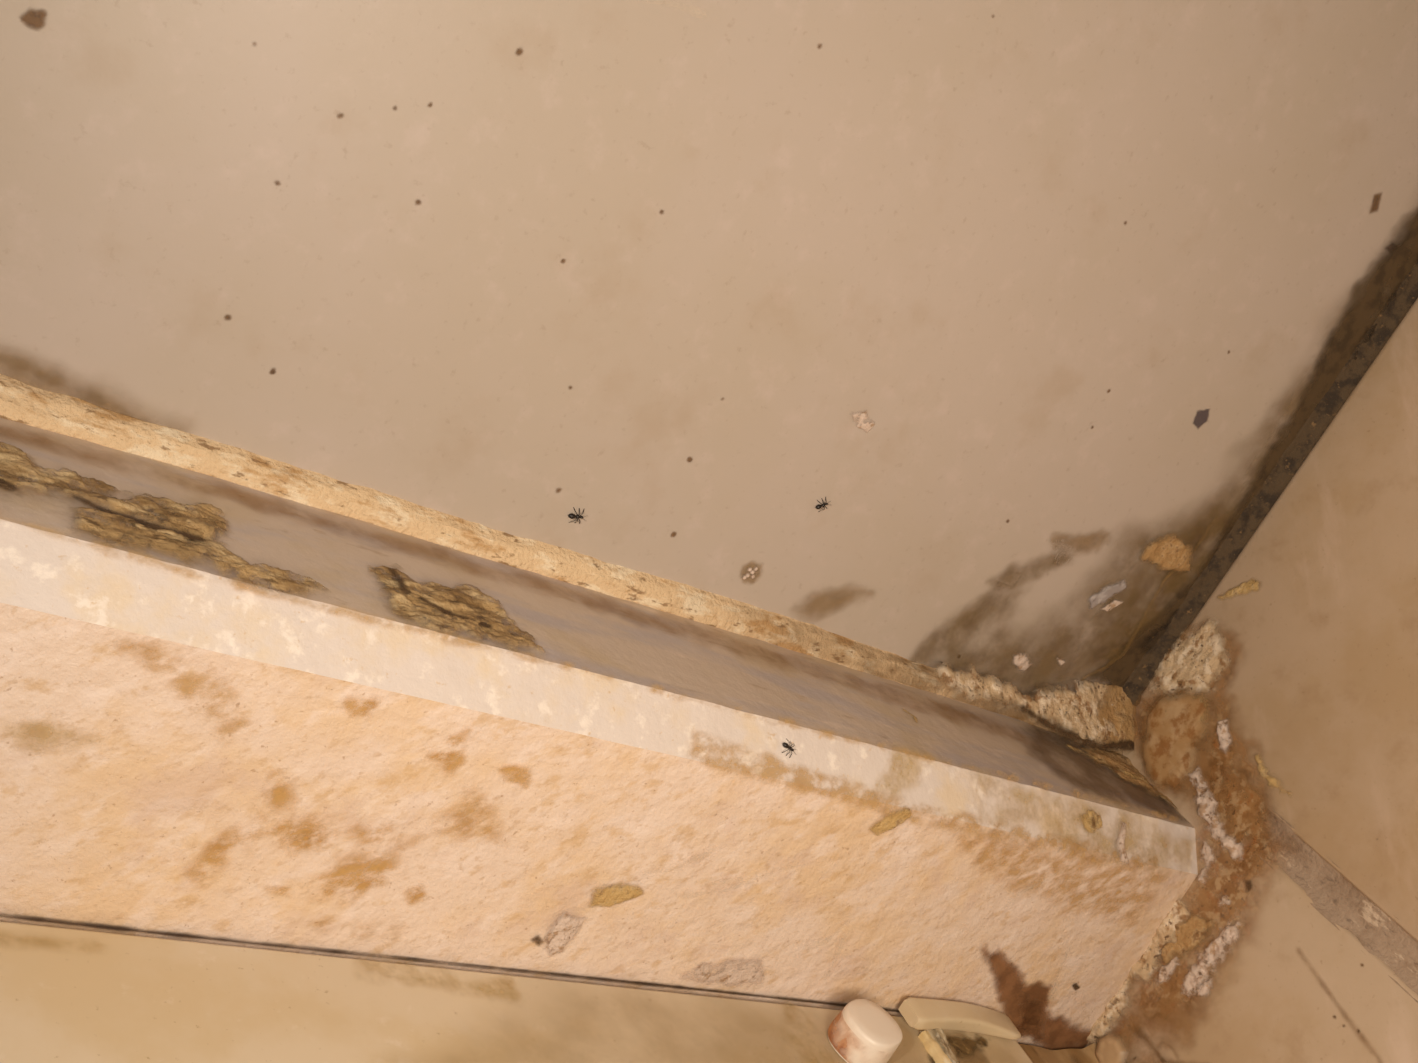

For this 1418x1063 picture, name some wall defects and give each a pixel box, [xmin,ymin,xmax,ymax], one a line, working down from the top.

peeling [0,442,323,594]
leakage [938,212,1418,750]
peeling [370,566,544,650]
peeling [1217,720,1231,752]
leakage [272,787,289,806]
leakage [325,860,392,895]
leakage [968,844,1158,912]
leakage [1087,899,1212,1041]